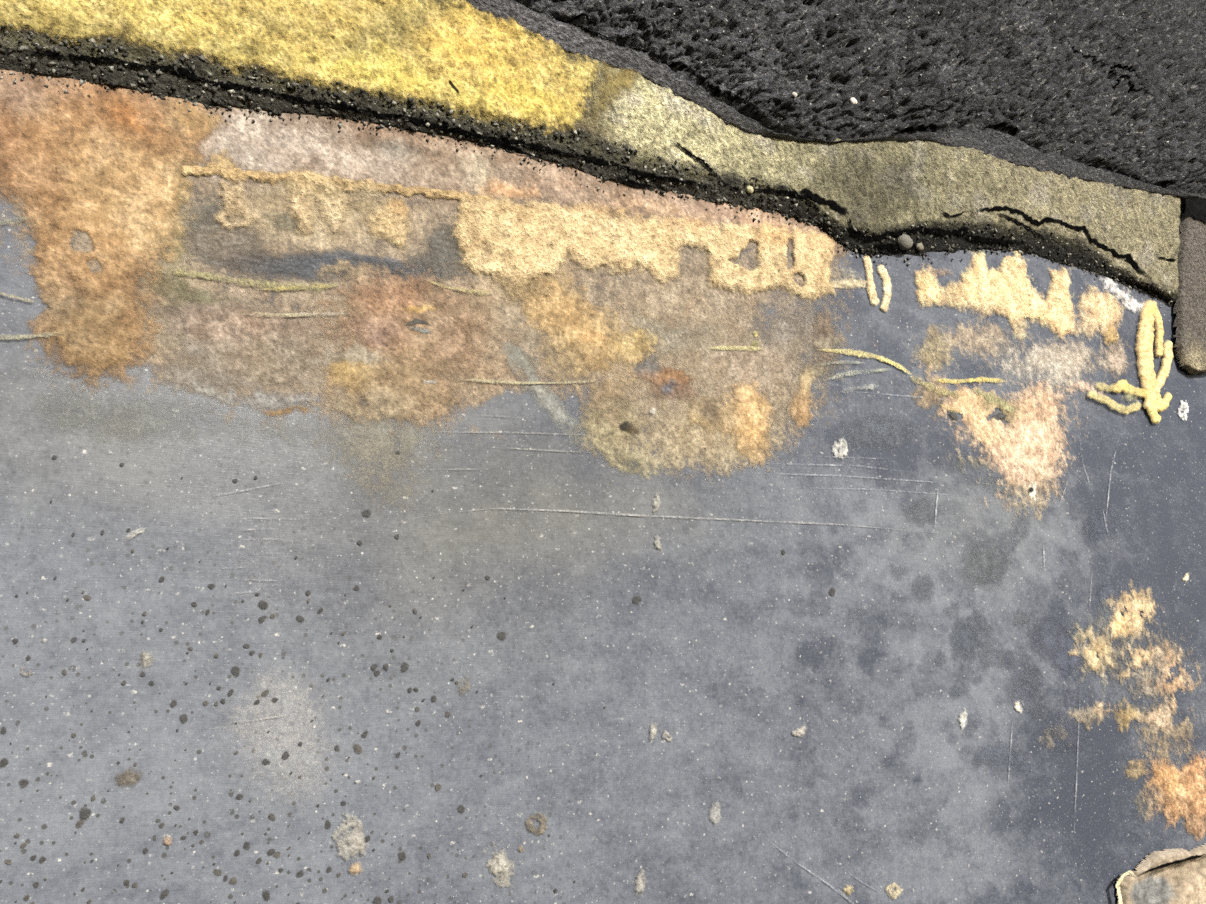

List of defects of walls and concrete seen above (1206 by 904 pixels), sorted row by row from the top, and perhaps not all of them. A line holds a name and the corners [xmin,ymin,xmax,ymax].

crack [527,6,765,115]
rust [0,70,235,385]
crack [1,47,1182,276]
rust [322,260,488,425]
rust [496,278,772,463]
rust [791,316,841,426]
rust [914,376,1102,505]
rust [1070,589,1206,839]